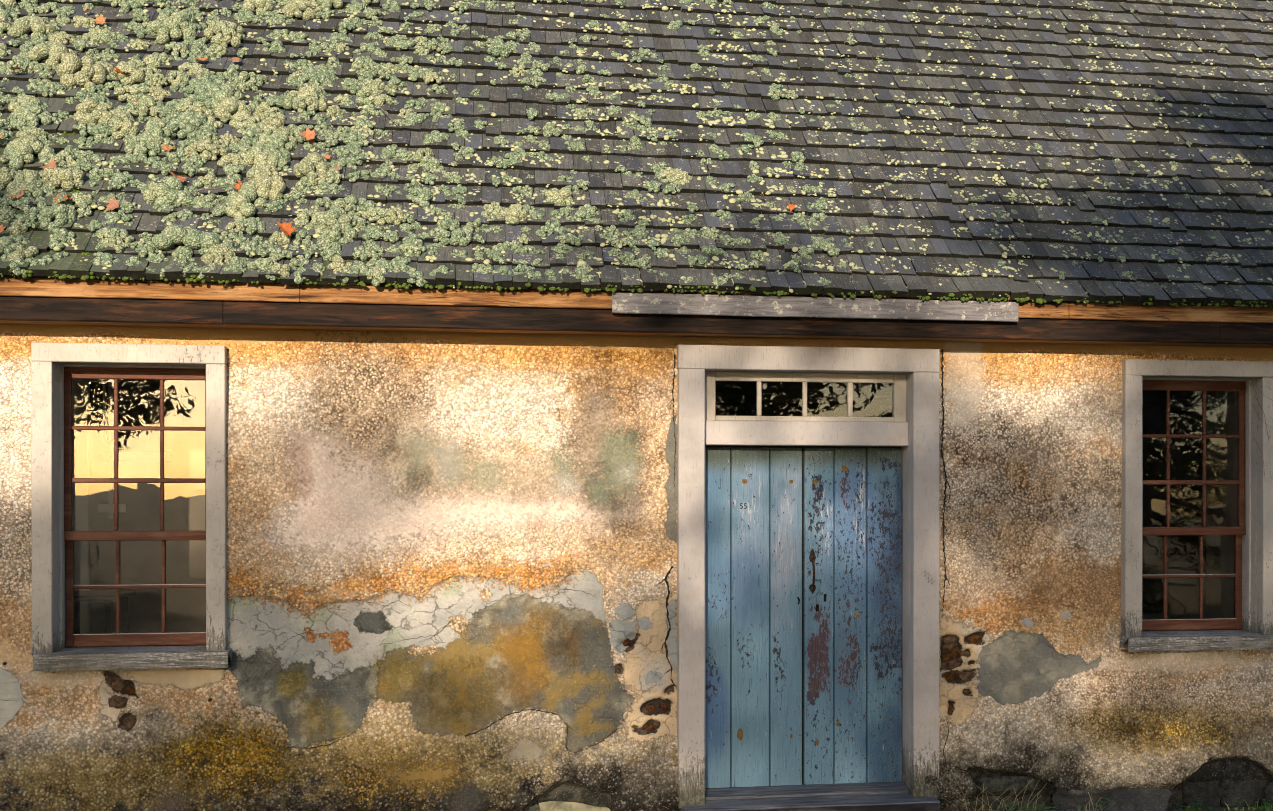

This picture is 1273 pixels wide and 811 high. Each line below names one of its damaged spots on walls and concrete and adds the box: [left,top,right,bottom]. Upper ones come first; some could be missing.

damp [296,332,427,473]
crack [941,349,951,611]
spalling [98,671,139,731]
damp [150,593,635,807]
spalling [225,570,677,744]
spalling [939,614,994,726]
damp [1085,704,1242,760]